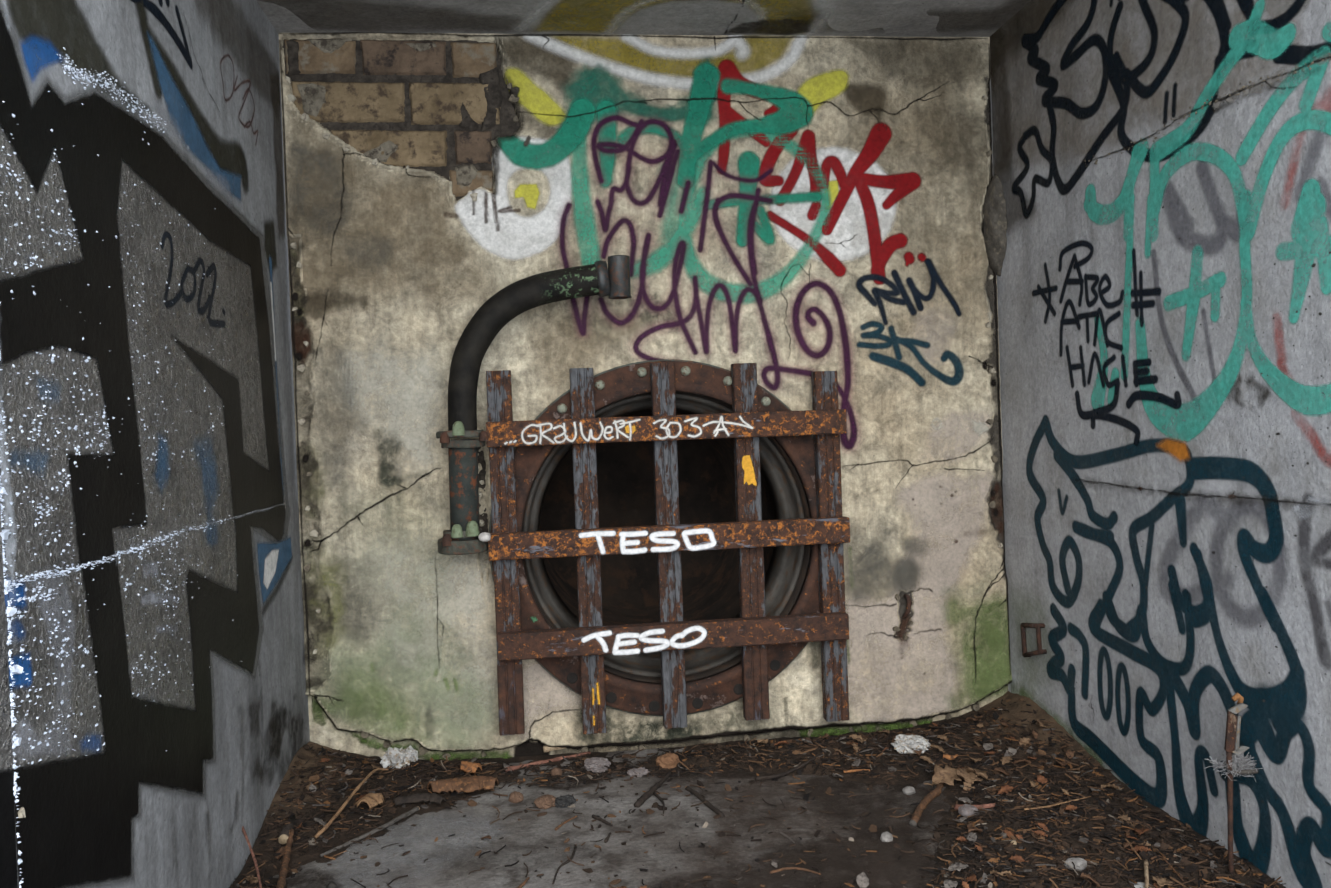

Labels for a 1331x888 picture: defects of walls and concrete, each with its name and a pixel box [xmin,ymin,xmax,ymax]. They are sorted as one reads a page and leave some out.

flaking render [282,38,531,231]
spalling [288,243,316,372]
crack [312,468,438,551]
peeling [296,264,1012,760]
water stain [850,541,920,599]
crack [846,442,989,483]